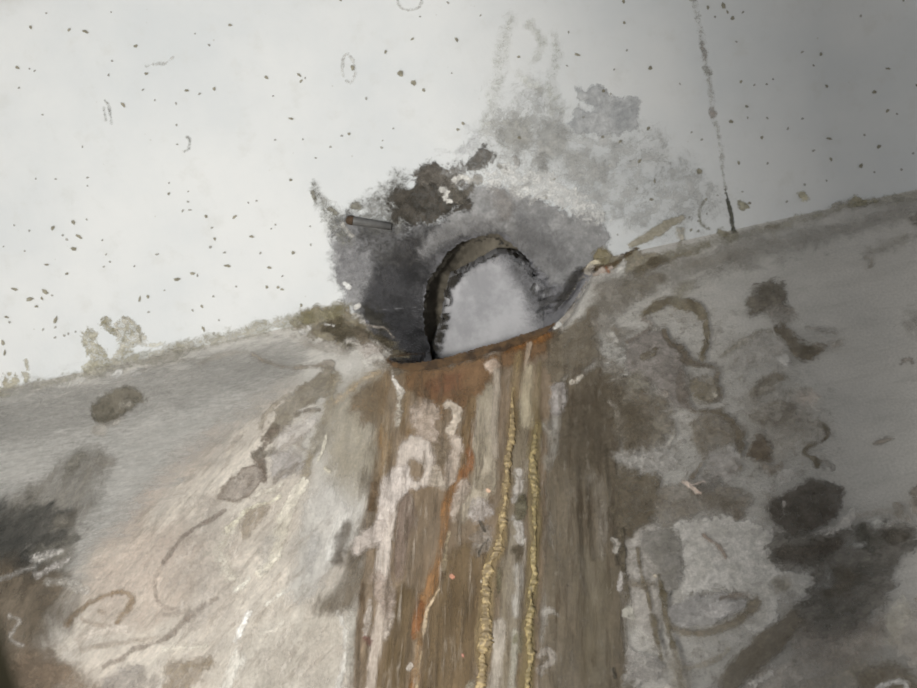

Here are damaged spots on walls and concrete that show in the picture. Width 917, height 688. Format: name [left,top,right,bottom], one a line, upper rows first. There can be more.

water stain [0,86,715,688]
corrosion [320,323,559,688]
spalling [418,231,594,362]
crack [696,16,749,243]
water stain [537,206,917,688]